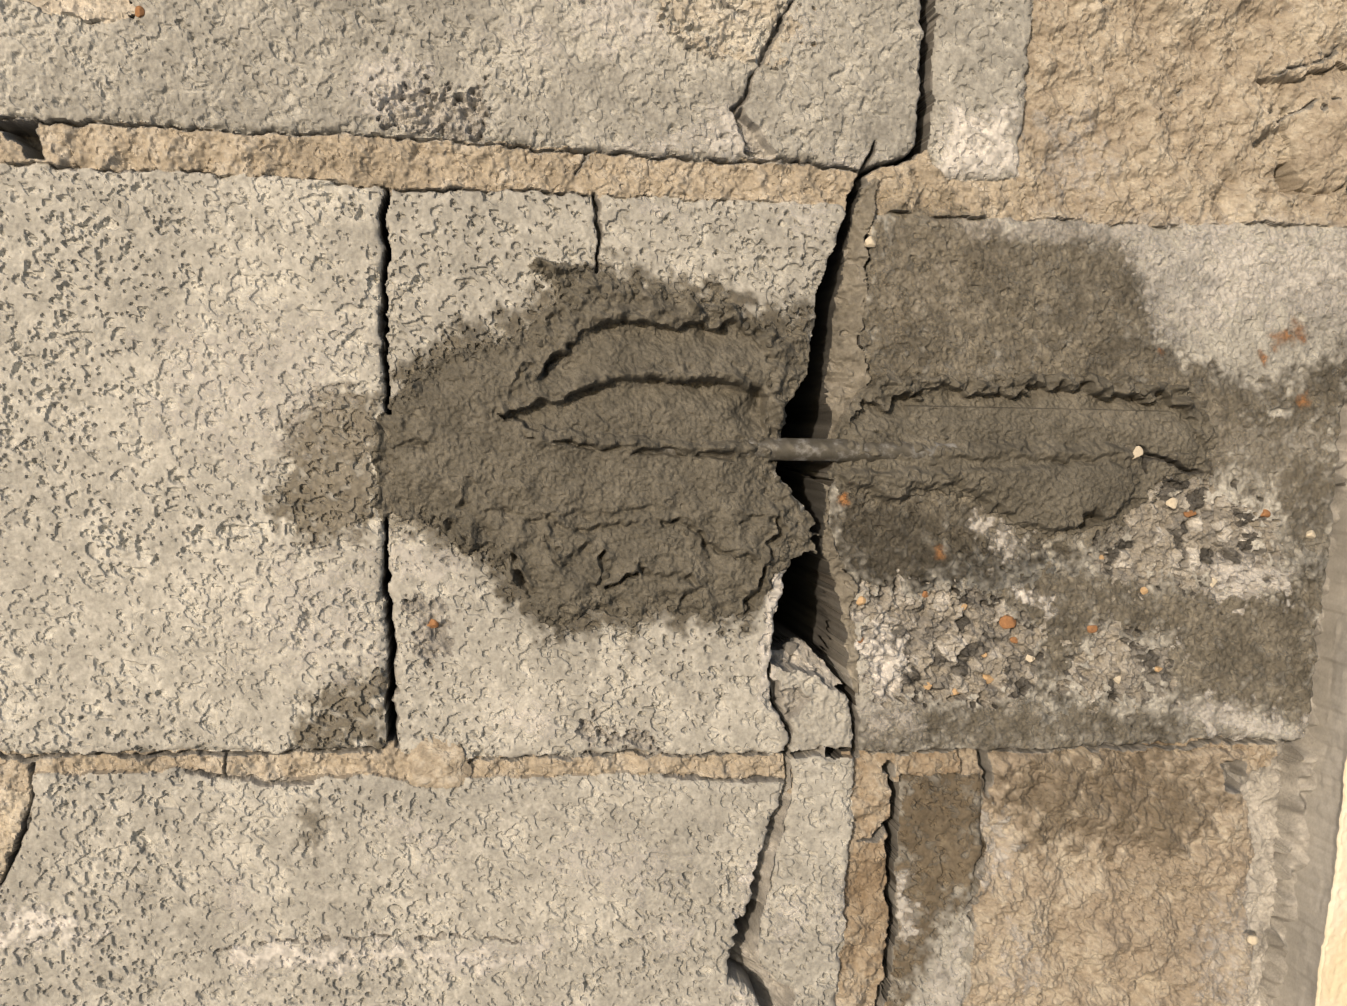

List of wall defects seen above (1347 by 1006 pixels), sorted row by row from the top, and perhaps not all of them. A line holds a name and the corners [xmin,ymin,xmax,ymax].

crack [1272,45,1343,77]
crack [1277,97,1342,124]
crack [0,0,941,439]
water stain [588,251,813,355]
water stain [263,274,558,623]
crack [1136,445,1204,476]
water stain [830,89,1347,1006]
water stain [543,569,787,700]
water stain [294,664,394,750]
crack [467,460,1277,1006]
crack [186,931,520,958]